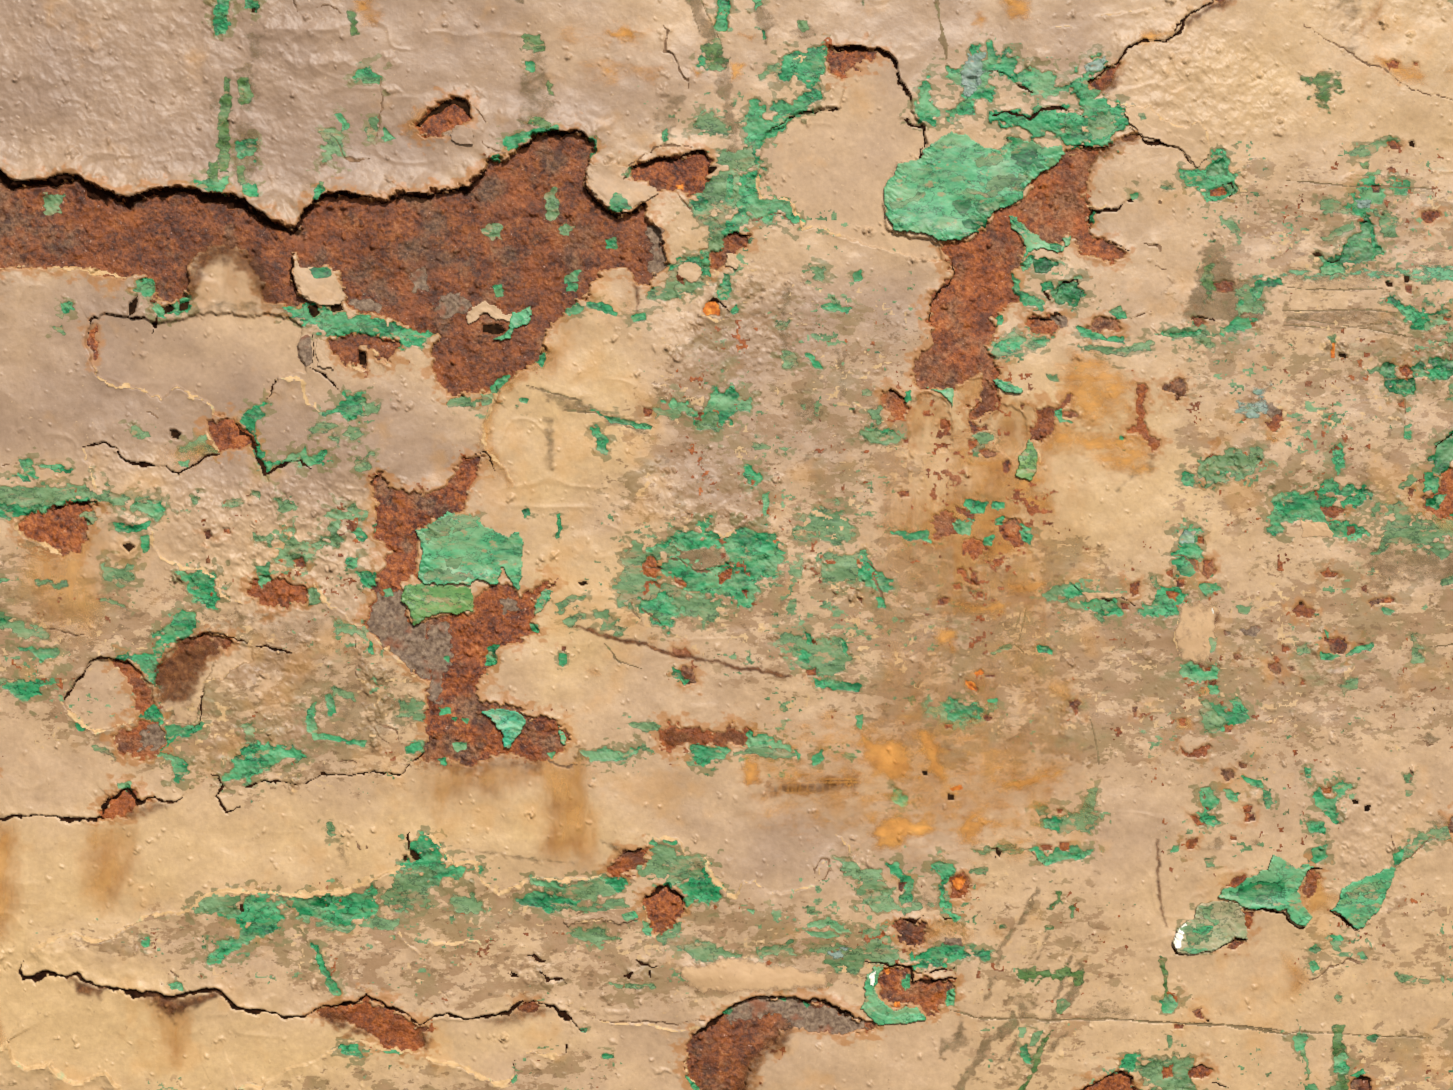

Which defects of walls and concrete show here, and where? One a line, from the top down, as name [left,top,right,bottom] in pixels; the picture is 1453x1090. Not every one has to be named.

peeling [586,153,659,213]
corrosion [629,143,717,197]
crack [770,107,838,131]
crack [834,45,859,53]
peeling [756,44,1065,261]
crack [989,0,1215,149]
peeling [288,253,346,305]
corrosion [0,122,668,767]
corrosion [815,134,1292,692]
corrosion [715,468,881,621]
peeling [1172,855,1314,955]
crack [19,960,705,1059]